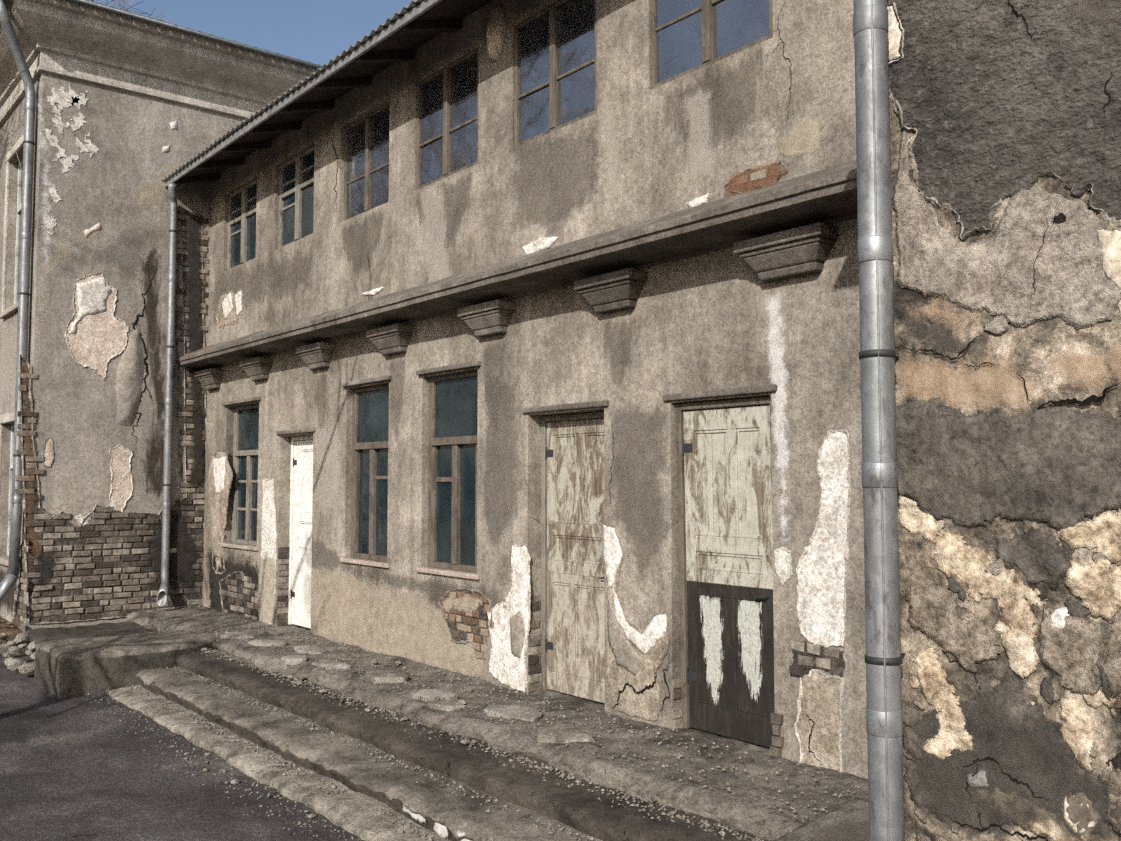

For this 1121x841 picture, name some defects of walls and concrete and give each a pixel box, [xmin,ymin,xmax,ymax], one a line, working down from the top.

crack [973,0,1055,49]
damp [422,189,449,282]
damp [517,138,593,221]
rust [725,163,781,196]
crack [131,259,158,446]
flaking render [12,210,290,631]
flaking render [889,89,1121,841]
flaking render [304,544,542,692]
flaking render [601,522,683,729]
peeling [700,595,764,705]
flaking render [770,430,851,772]
crack [937,757,1053,841]